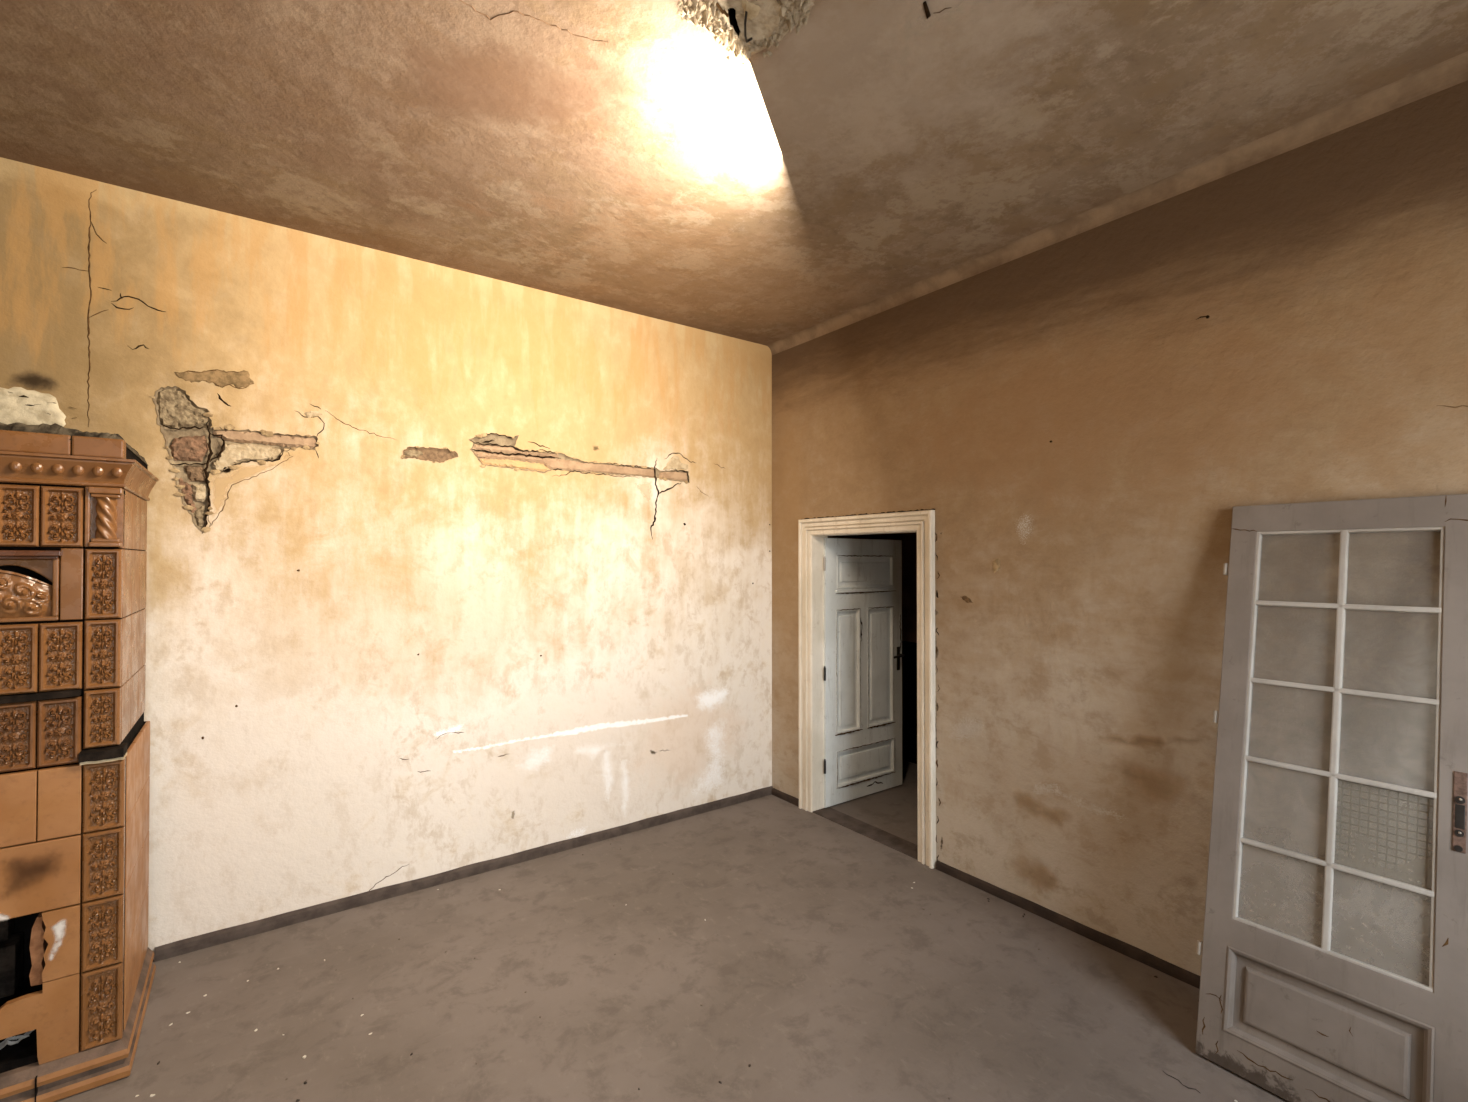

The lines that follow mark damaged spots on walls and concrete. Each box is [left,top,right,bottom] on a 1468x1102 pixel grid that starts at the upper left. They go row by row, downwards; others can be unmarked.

peeling [728,0,761,36]
crack [62,190,165,427]
flaking render [149,369,320,534]
flaking render [401,433,695,484]
water stain [575,742,633,814]